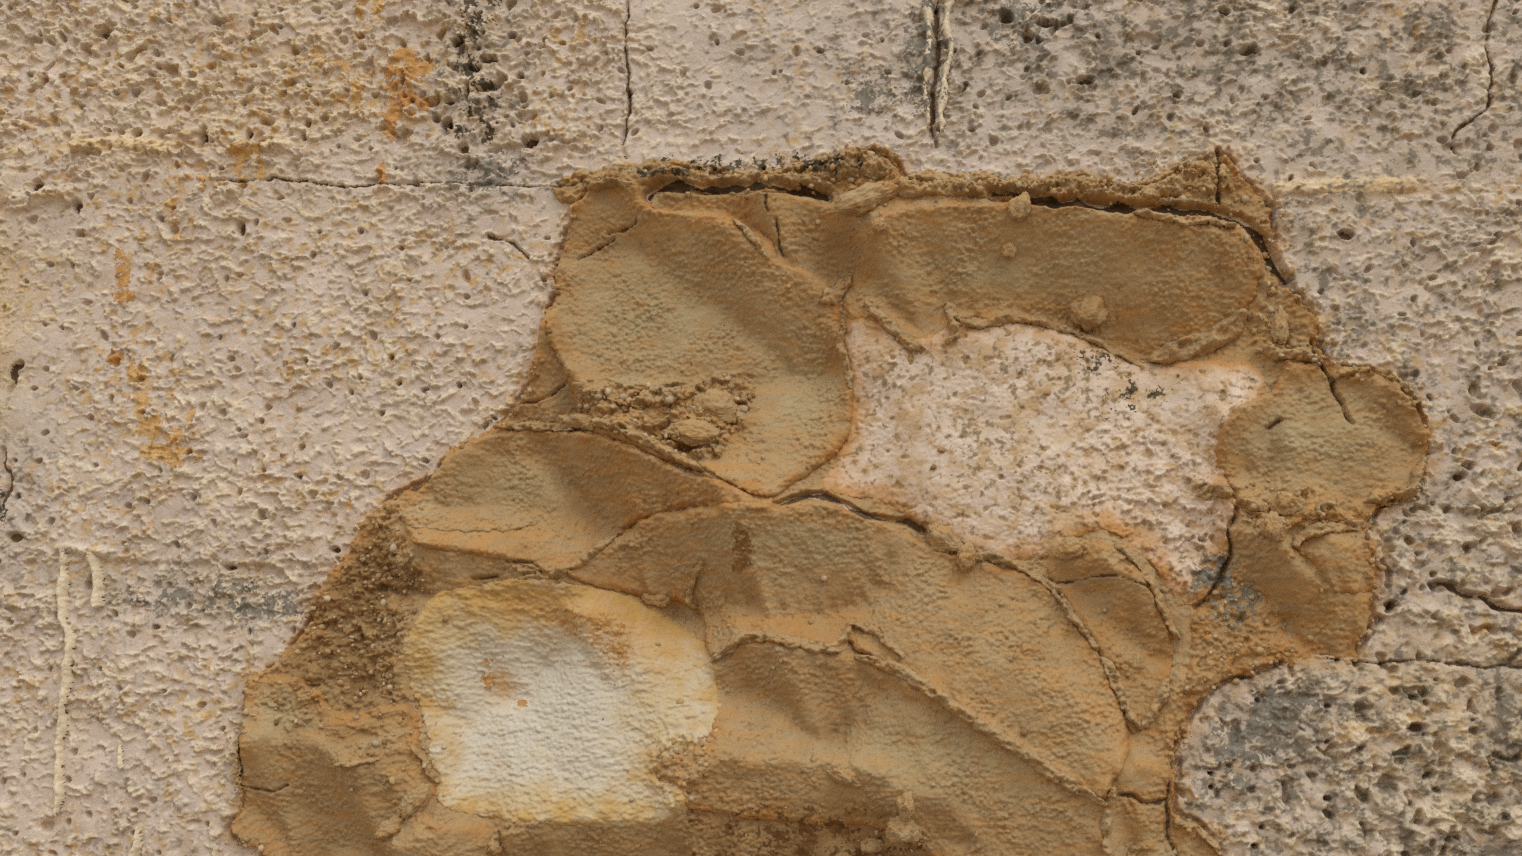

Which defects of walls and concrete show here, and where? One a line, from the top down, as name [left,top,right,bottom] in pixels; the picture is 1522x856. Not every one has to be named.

crack [930,0,941,138]
crack [1450,0,1498,154]
flaking render [821,318,1267,605]